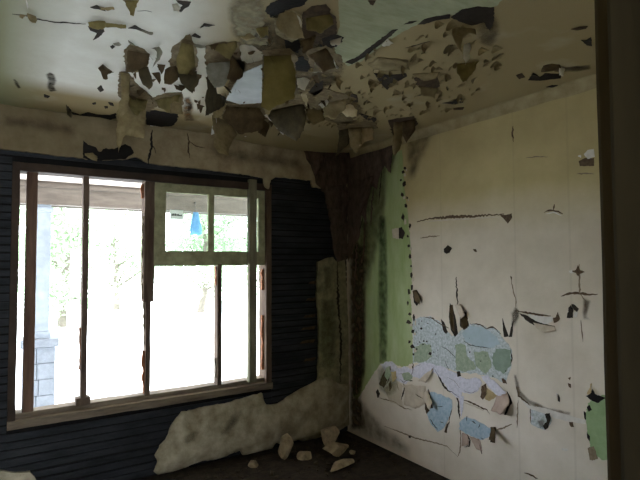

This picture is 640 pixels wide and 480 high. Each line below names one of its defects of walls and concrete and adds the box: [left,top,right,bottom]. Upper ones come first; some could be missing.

crack [148,130,156,164]
peeling [577,149,595,175]
flaking render [0,0,504,480]
crack [417,214,512,238]
crack [562,264,597,300]
leakage [324,180,387,437]
peeling [502,311,517,337]